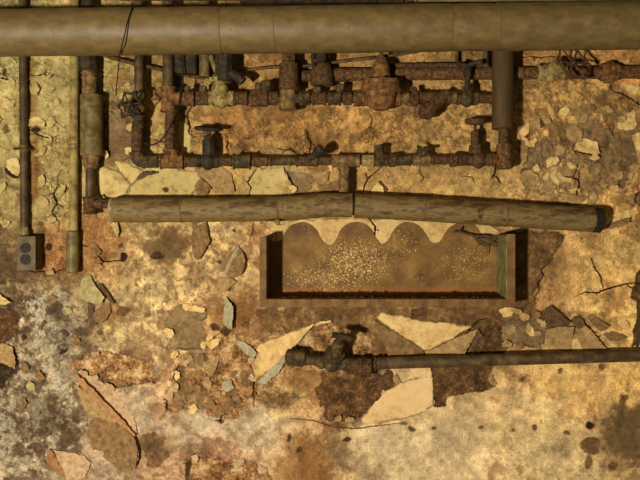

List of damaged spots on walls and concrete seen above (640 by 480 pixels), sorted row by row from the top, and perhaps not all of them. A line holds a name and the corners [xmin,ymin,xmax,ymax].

peeling [625,85,640,94]
peeling [516,104,640,203]
crack [47,173,63,231]
crack [574,259,640,298]
flaking render [0,295,45,411]
peeling [57,329,80,354]
flaking render [163,297,401,429]
flaking render [70,350,169,472]
leakage [601,394,640,471]
peeling [46,449,91,480]
flaking render [183,454,270,480]